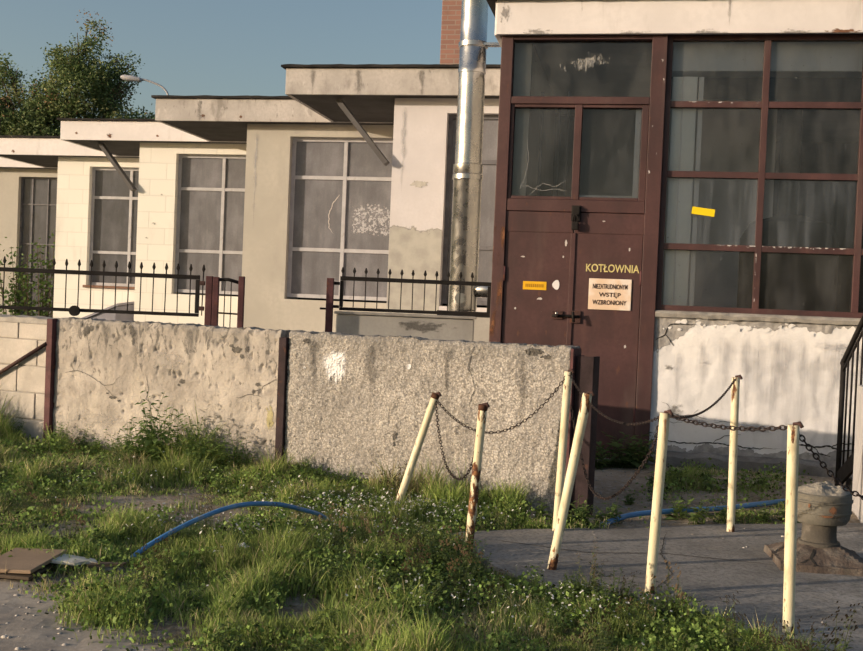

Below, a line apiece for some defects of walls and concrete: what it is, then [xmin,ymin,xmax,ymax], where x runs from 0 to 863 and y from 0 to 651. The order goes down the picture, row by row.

crack [656,323,696,346]
peeling [654,317,857,353]
peeling [649,442,787,459]